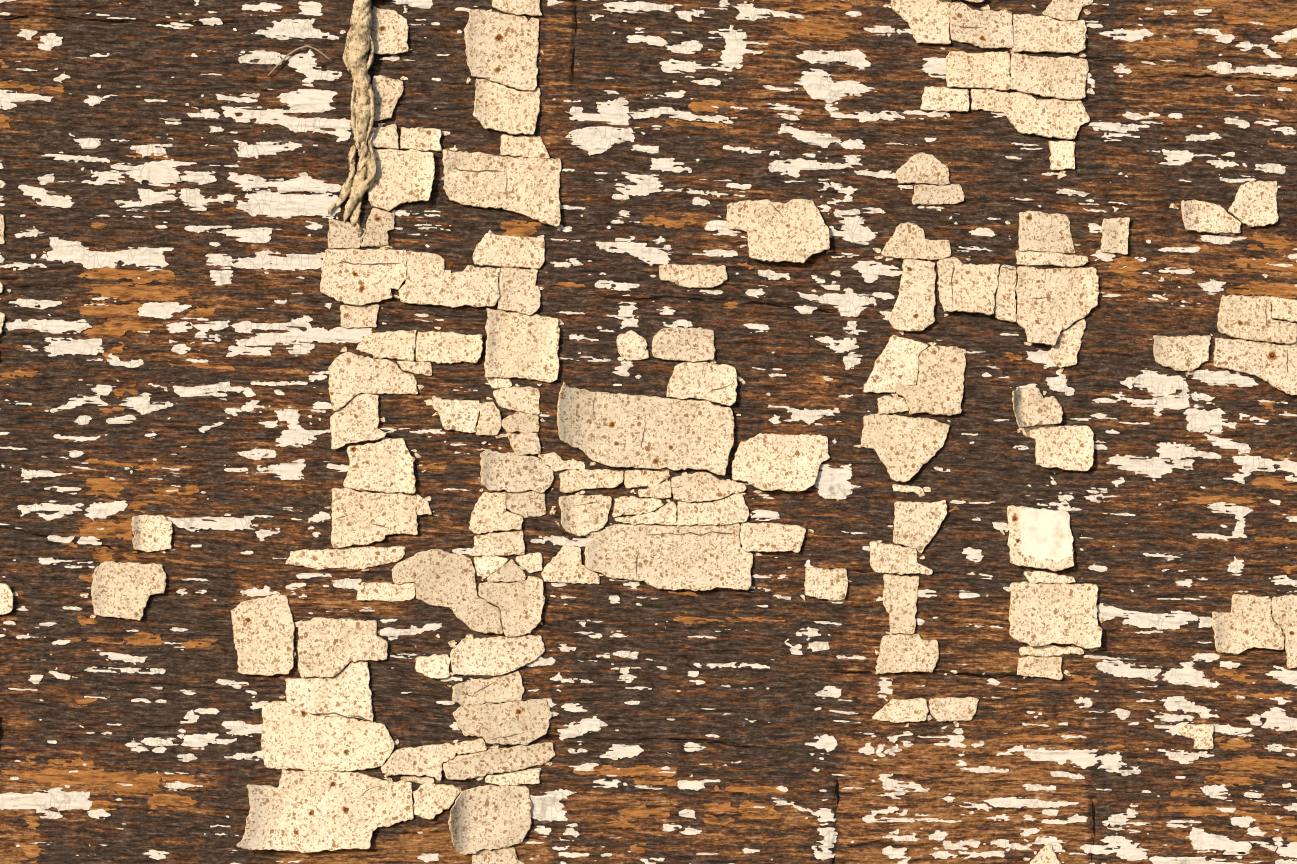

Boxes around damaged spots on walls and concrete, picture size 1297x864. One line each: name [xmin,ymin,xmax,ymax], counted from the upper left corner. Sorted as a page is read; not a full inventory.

peeling [890,0,1093,170]
peeling [895,152,965,205]
peeling [1153,181,1297,412]
peeling [231,0,830,864]
peeling [861,211,1149,686]
peeling [0,583,14,615]
peeling [62,459,218,649]
peeling [804,567,848,601]
peeling [872,697,979,723]
peeling [1212,594,1297,710]
peeling [1,753,197,814]
peeling [1166,724,1297,842]